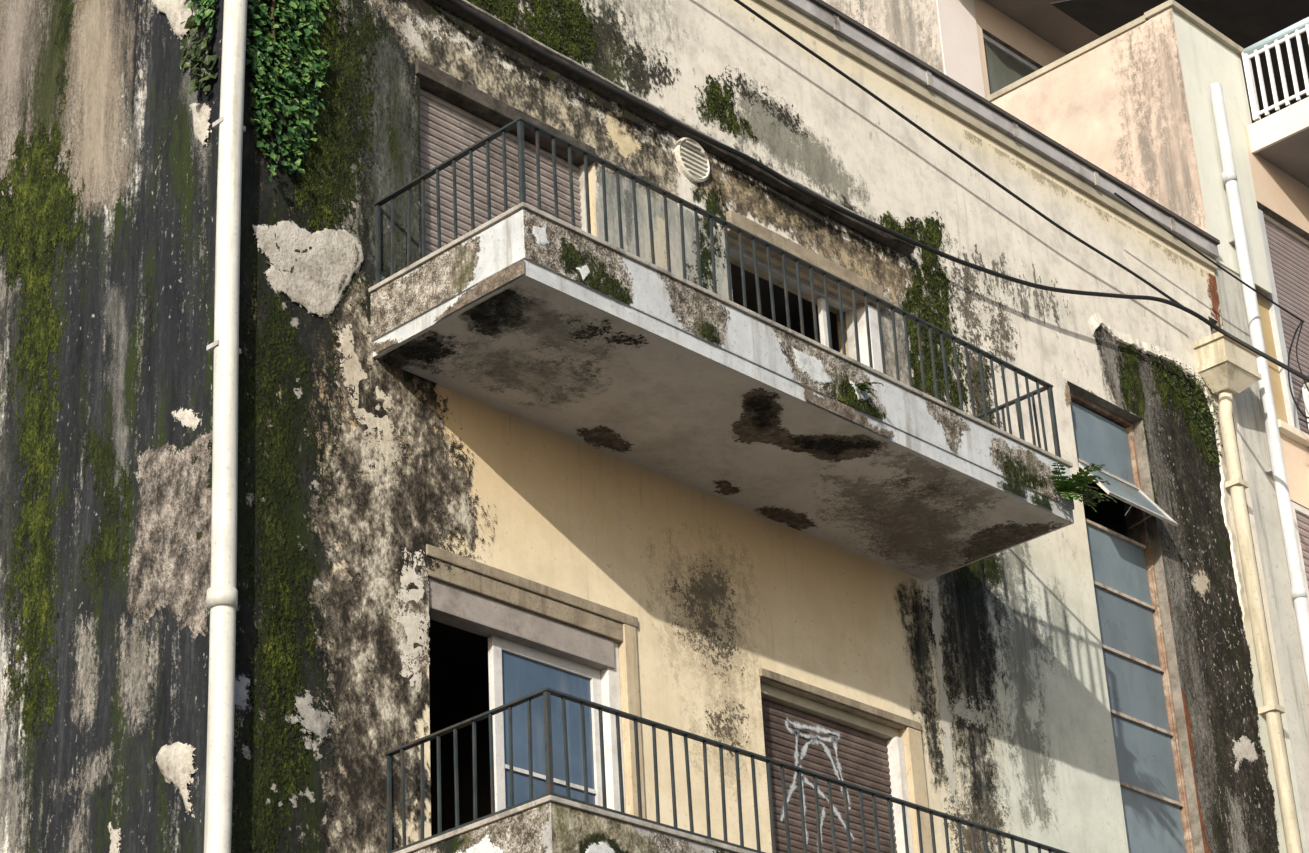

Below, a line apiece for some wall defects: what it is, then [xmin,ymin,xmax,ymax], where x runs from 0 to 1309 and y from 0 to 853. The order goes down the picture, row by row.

peeling [0,0,140,291]
leakage [104,287,128,497]
leakage [321,0,917,400]
rust [1207,273,1223,328]
leakage [396,408,497,585]
peeling [265,209,705,853]
leakage [0,774,29,853]
leakage [53,743,113,853]
leakage [71,614,100,731]
leakage [115,615,159,729]
leakage [665,554,749,757]
leakage [896,542,1082,853]